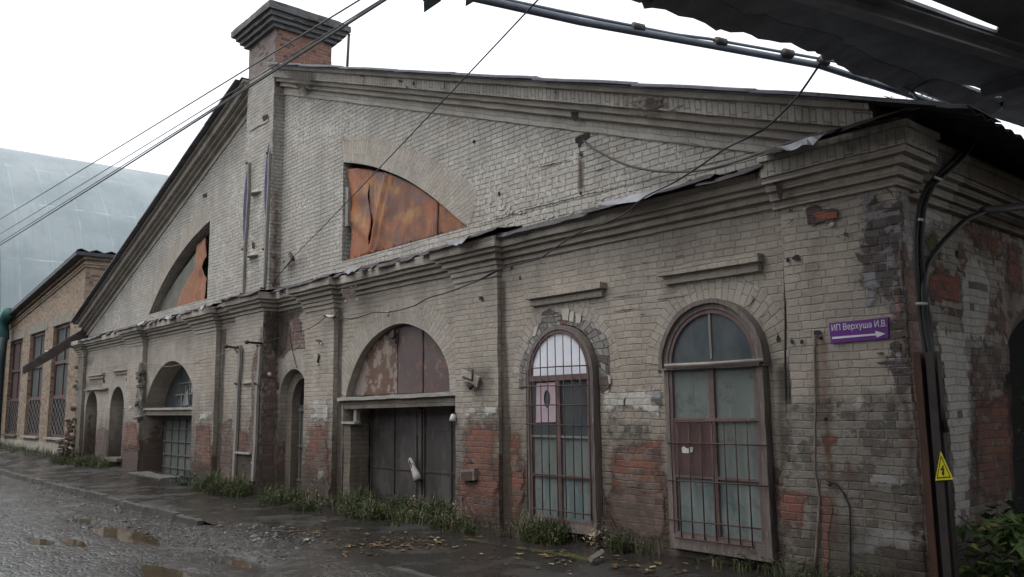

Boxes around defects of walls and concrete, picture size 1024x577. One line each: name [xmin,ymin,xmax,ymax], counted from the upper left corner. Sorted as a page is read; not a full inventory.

peeling [194,312,305,495]
peeling [458,419,524,526]
spalling [608,486,664,537]
peeling [779,194,961,577]
peeling [972,342,1014,503]